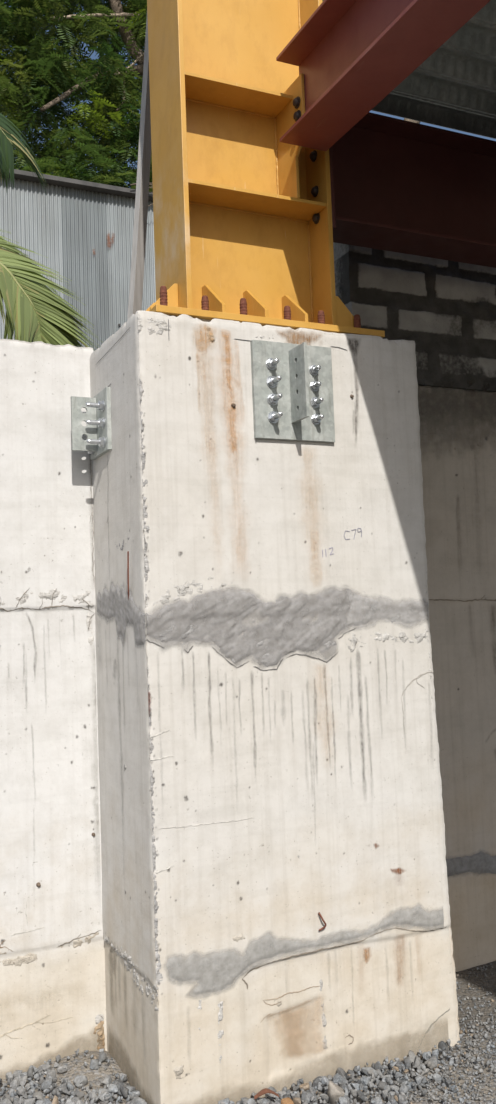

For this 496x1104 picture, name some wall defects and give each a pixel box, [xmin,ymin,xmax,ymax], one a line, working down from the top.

crack [0,455,109,630]
crack [429,594,496,602]
spalling [59,657,163,1013]
crack [0,902,100,951]
spalling [0,952,37,966]